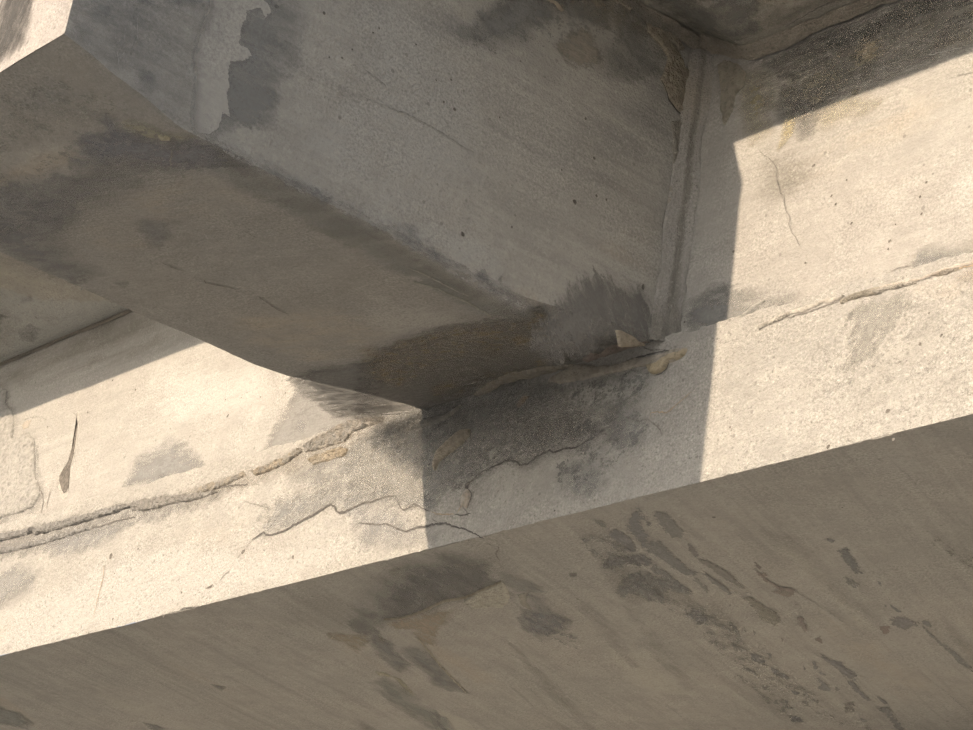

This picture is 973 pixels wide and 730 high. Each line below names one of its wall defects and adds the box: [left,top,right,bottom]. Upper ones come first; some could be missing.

peeling [194,0,271,135]
damp [221,0,283,129]
flaking render [644,20,689,114]
damp [777,0,973,133]
crack [58,412,80,500]
crack [180,392,691,610]
damp [265,268,650,527]
flaking render [548,347,688,416]
damp [352,556,487,728]